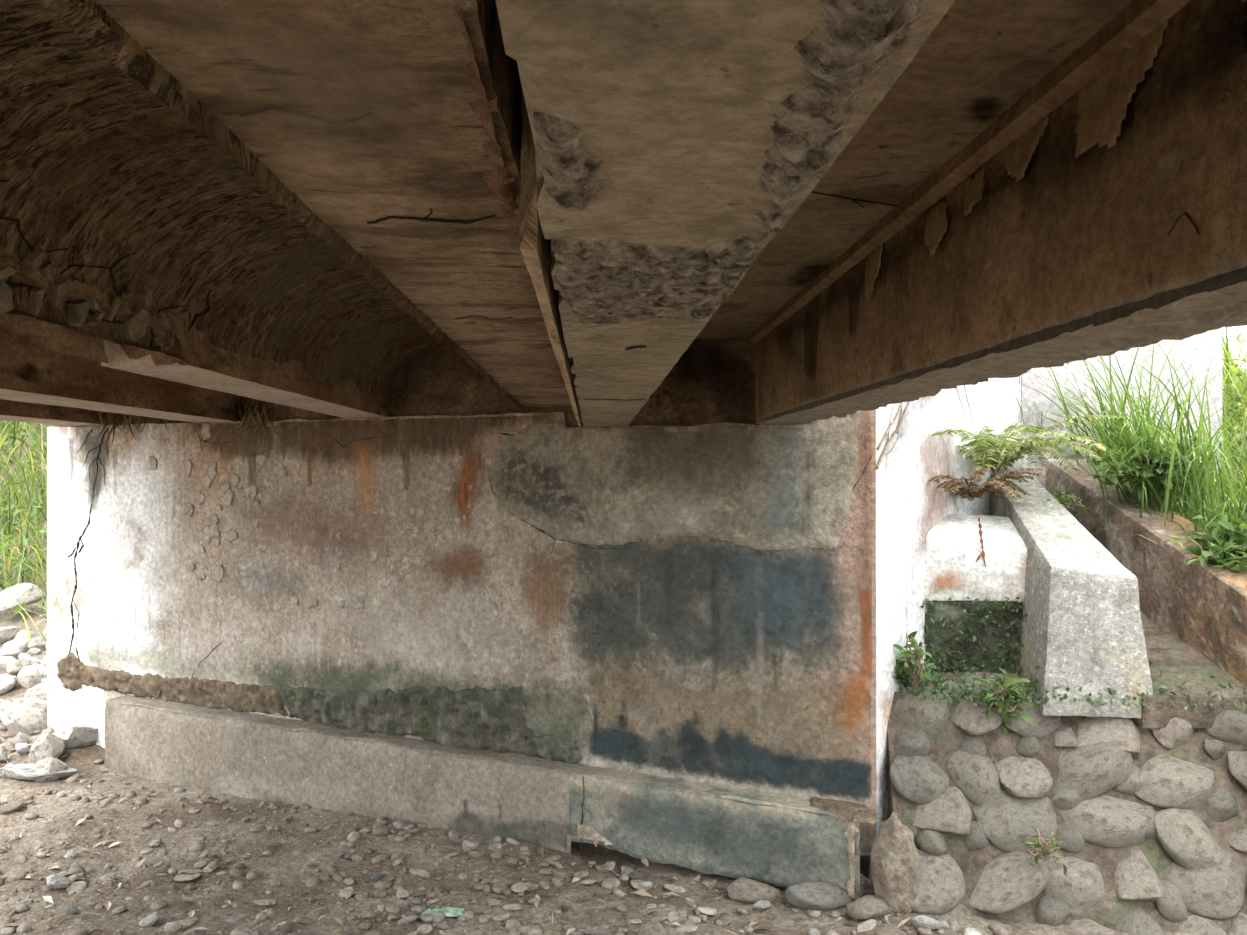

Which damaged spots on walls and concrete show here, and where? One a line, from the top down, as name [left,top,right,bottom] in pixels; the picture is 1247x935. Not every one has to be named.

spalling [533,112,605,212]
spalling [550,0,922,326]
crack [367,208,495,224]
crack [0,216,212,351]
rust [454,453,480,525]
leakage [501,453,585,519]
leakage [629,430,756,479]
crack [67,504,92,662]
leakage [573,506,888,801]
rust [849,591,871,709]
crack [580,775,592,850]